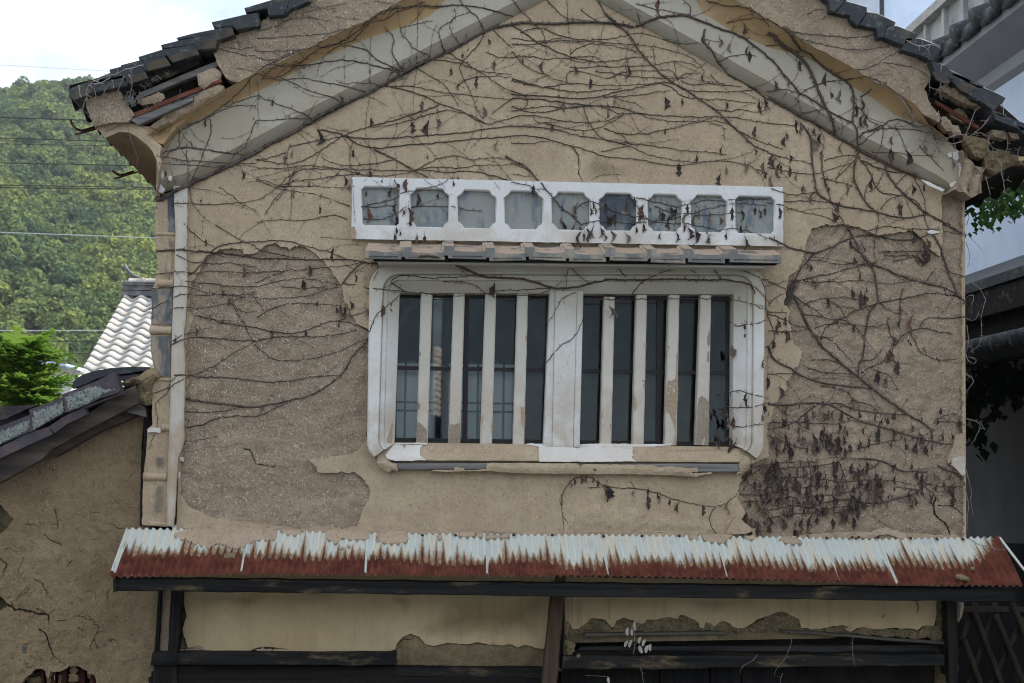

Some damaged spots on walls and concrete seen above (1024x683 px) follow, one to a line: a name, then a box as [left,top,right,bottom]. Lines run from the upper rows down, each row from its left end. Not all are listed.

flaking render [920,151,961,192]
flaking render [385,422,427,461]
flaking render [448,423,460,443]
flaking render [526,346,678,462]
flaking render [696,396,709,445]
flaking render [946,433,966,476]
crack [0,454,140,668]
corrosion [109,528,1023,587]
flaking render [396,634,544,666]
flaking render [563,601,943,658]
flaking render [27,666,96,683]